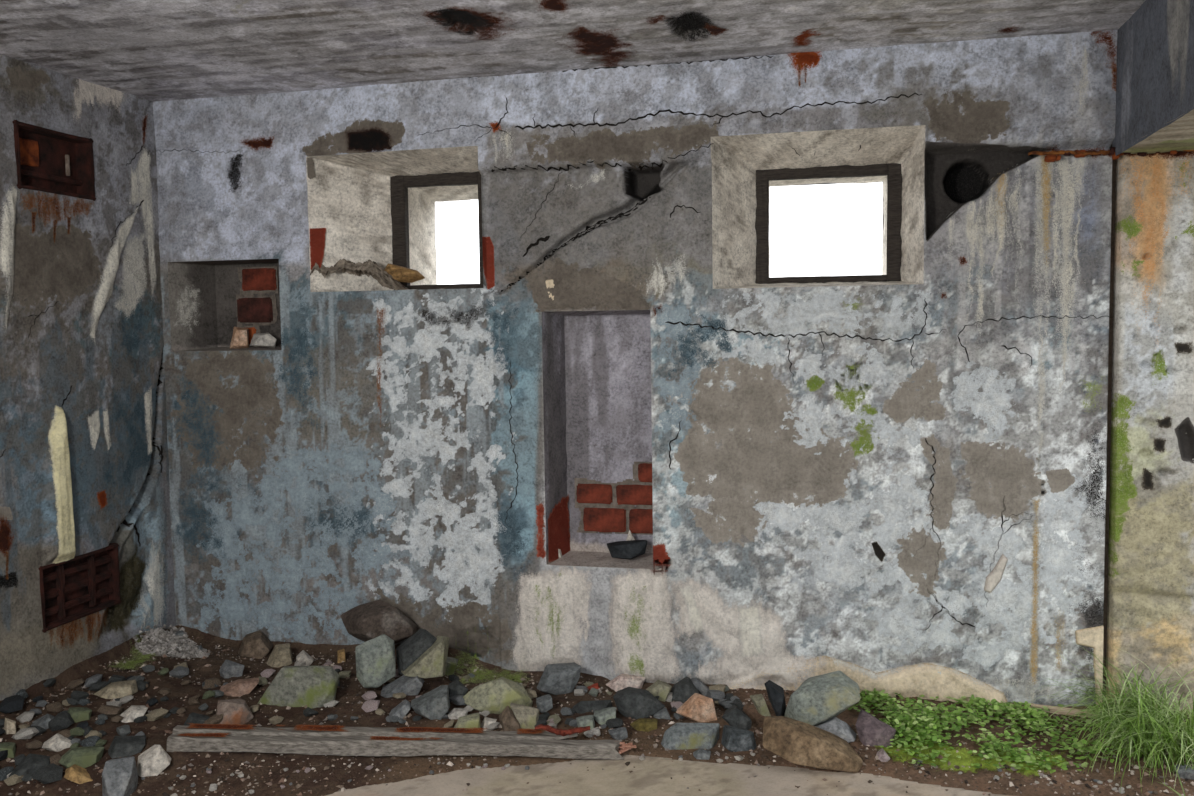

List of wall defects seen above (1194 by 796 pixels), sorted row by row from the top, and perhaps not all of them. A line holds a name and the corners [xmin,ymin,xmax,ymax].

spalling [428,8,496,36]
corrosion [787,28,825,86]
corrosion [12,120,96,242]
peeling [302,118,405,179]
crack [419,93,922,292]
corrosion [1028,141,1194,164]
crack [665,300,1112,382]
peeling [167,228,517,664]
peeling [652,303,1104,707]
crack [914,438,1029,630]
leakage [935,139,1107,702]
corrosion [38,543,121,649]